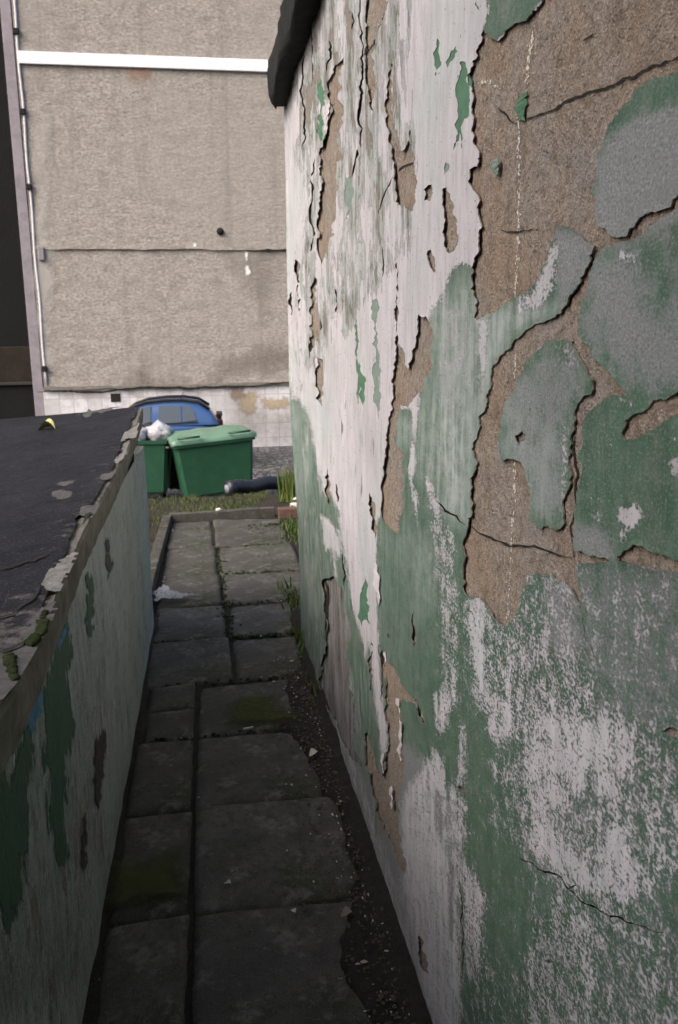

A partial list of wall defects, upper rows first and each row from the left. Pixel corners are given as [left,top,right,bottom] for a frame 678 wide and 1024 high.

spalling [317,60,354,263]
spalling [366,0,459,253]
crack [498,56,678,125]
peeling [105,537,114,580]
spalling [294,260,324,405]
spalling [355,298,433,536]
crack [442,432,578,559]
spalling [433,0,678,627]
peeling [0,617,107,936]
spalling [319,562,426,873]
spalling [418,936,428,972]
crack [526,861,663,933]